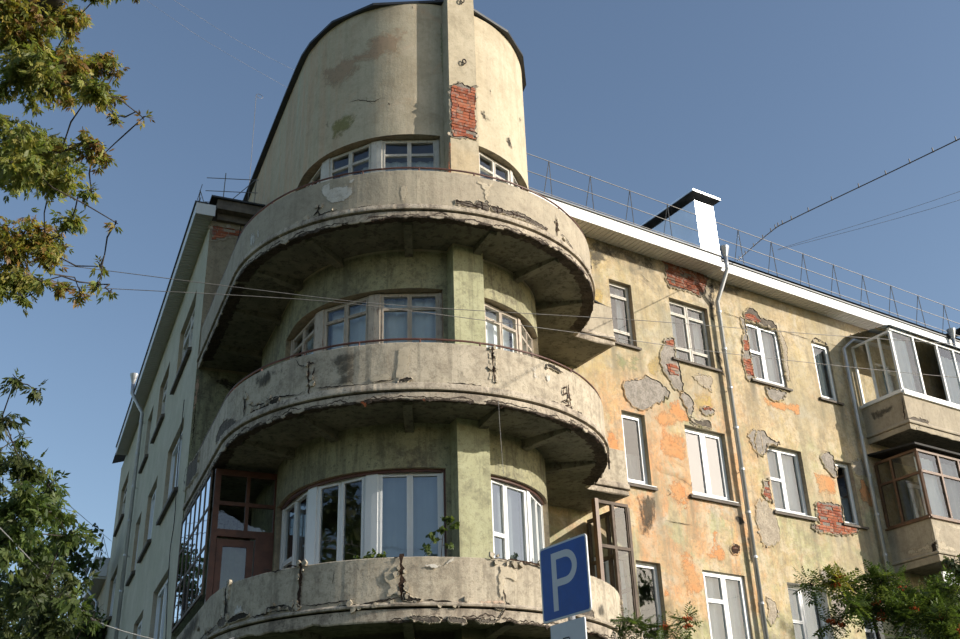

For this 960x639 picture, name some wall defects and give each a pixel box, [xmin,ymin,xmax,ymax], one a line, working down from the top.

spalling [447,82,479,141]
spalling [200,179,603,364]
spalling [658,259,710,298]
spalling [739,306,799,415]
spalling [621,336,716,460]
spalling [747,428,781,458]
water stain [637,495,655,535]
spalling [810,451,859,537]
crack [196,554,468,639]
spalling [384,564,559,630]
spalling [580,610,615,639]
spalling [819,569,847,623]